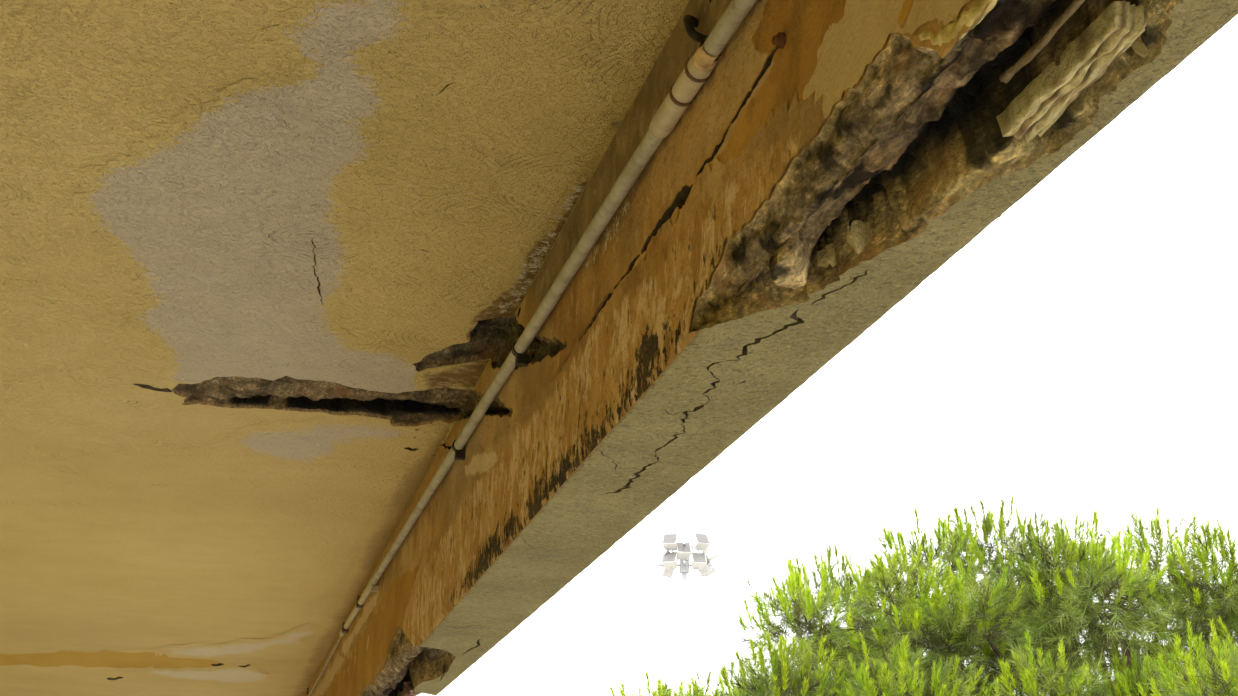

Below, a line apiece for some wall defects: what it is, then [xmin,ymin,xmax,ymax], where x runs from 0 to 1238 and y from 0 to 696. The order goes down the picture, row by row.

leakage [0,421,454,696]
peeling [71,0,525,472]
crack [312,238,323,304]
leakage [414,359,489,391]
leakage [448,312,685,604]
rust [307,0,846,696]
leakage [460,0,764,343]
crack [560,48,779,371]
crack [598,269,869,495]
spalling [360,0,1179,696]